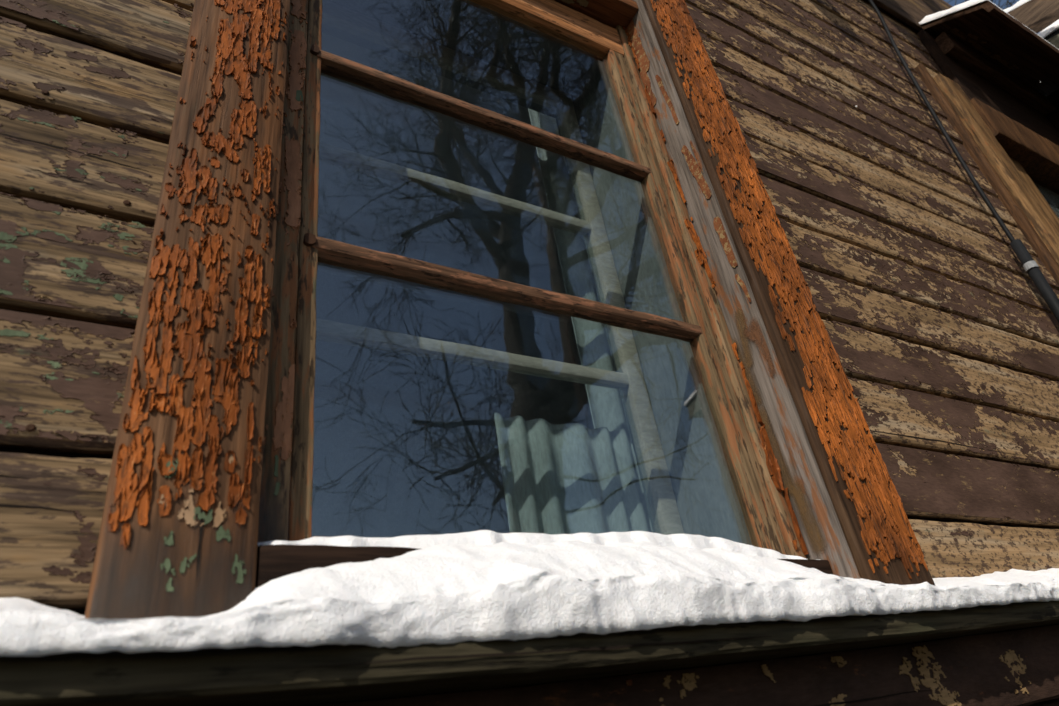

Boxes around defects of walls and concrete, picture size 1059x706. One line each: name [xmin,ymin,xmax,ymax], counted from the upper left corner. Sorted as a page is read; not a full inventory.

peeling [623,19,679,125]
peeling [667,140,712,203]
peeling [0,0,308,547]
peeling [684,0,1059,523]
peeling [732,343,809,555]
peeling [41,510,98,583]
peeling [950,528,975,541]
peeling [659,673,699,706]
peeling [899,645,962,706]
peeling [999,650,1031,694]